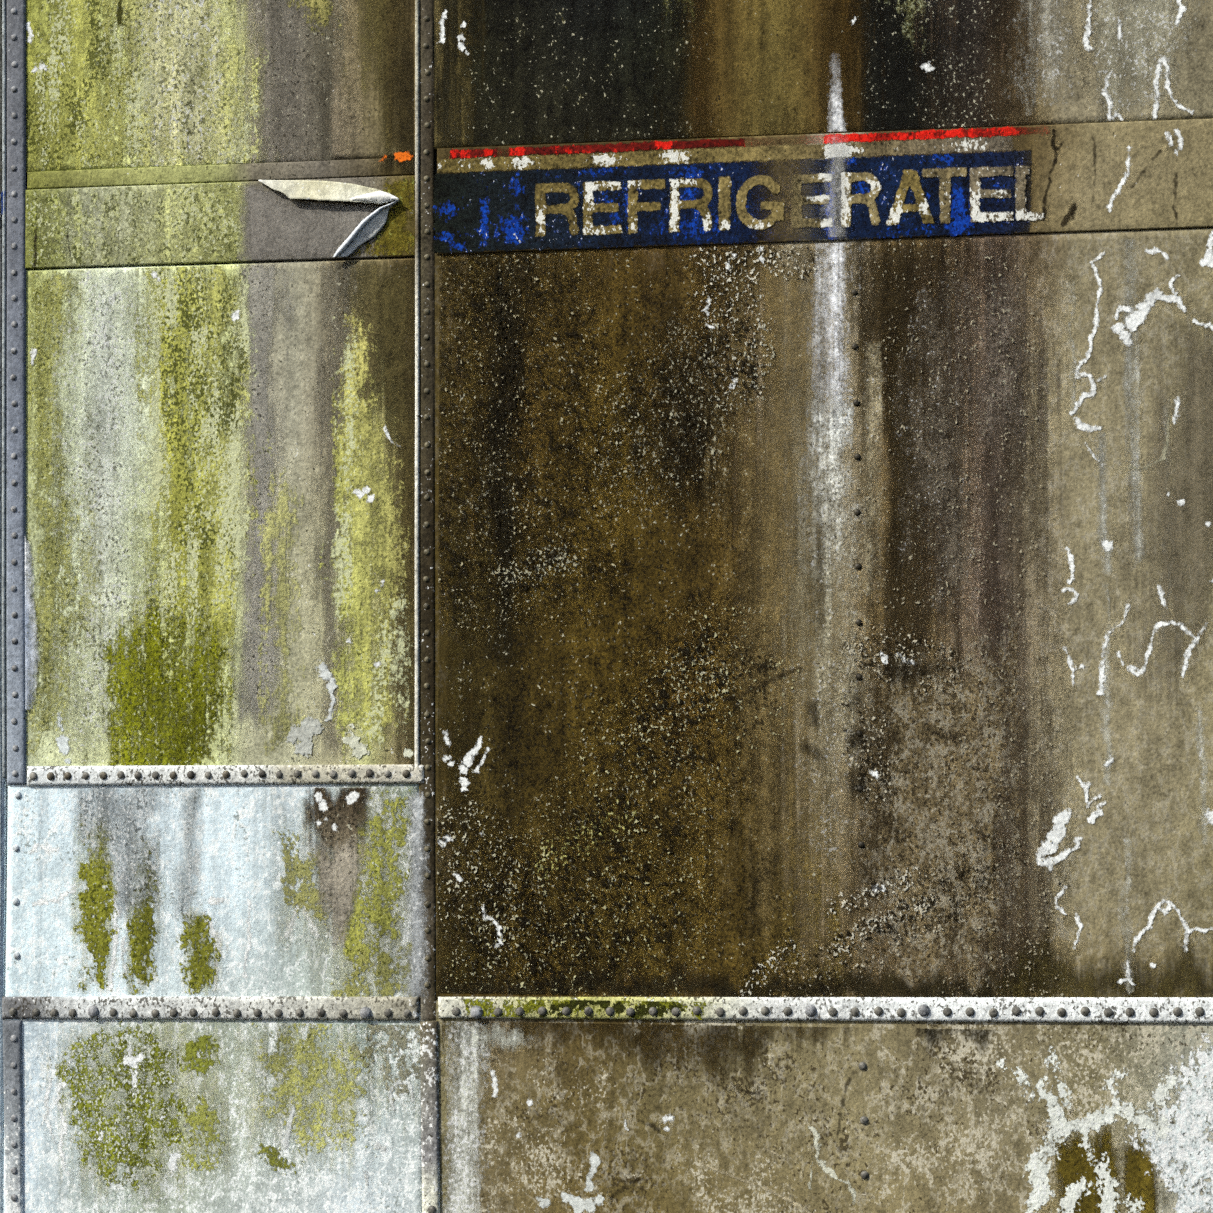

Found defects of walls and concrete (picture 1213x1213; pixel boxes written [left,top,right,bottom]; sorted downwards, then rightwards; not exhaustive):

damp [26,0,342,171]
peeling [239,177,414,260]
peeling [1069,252,1213,469]
damp [26,264,305,765]
damp [317,259,415,763]
damp [439,239,1213,997]
peeling [1097,604,1204,695]
damp [71,787,161,995]
damp [176,789,221,995]
peeling [1036,808,1082,871]
peeling [1118,899,1212,985]
peeling [996,1033,1213,1213]